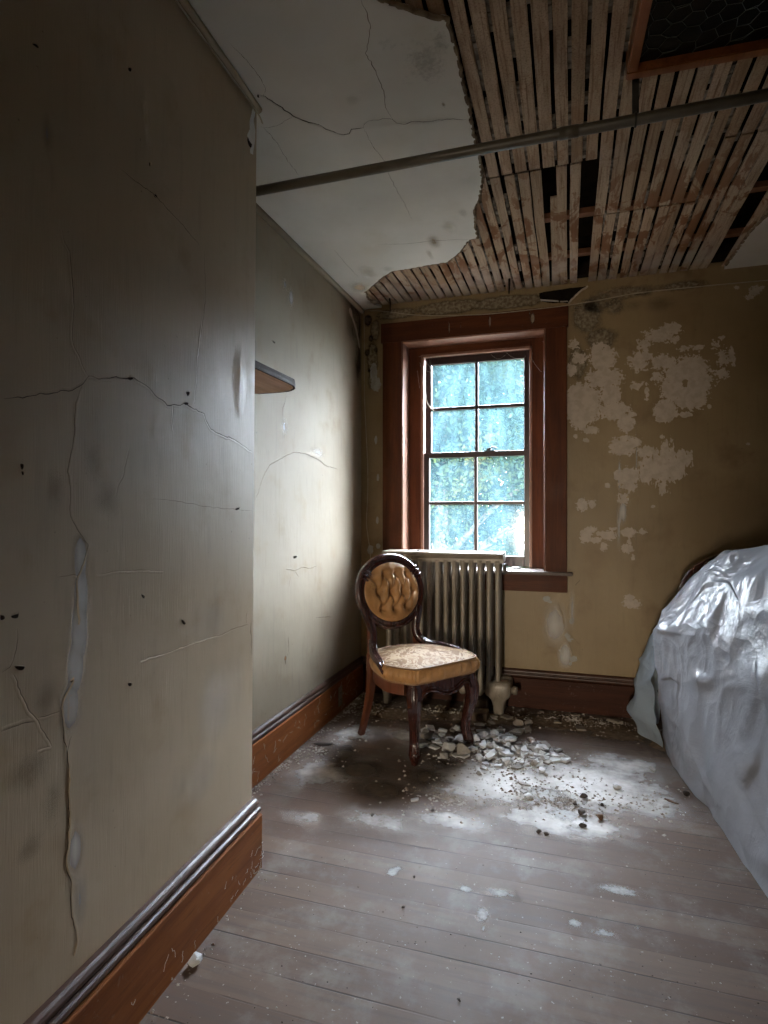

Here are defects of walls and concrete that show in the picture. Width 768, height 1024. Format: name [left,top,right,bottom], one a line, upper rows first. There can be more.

crack [243,1,468,215]
flaking render [364,0,768,310]
crack [161,451,337,511]
peeling [579,526,648,560]
peeling [567,322,736,508]
crack [50,680,79,956]